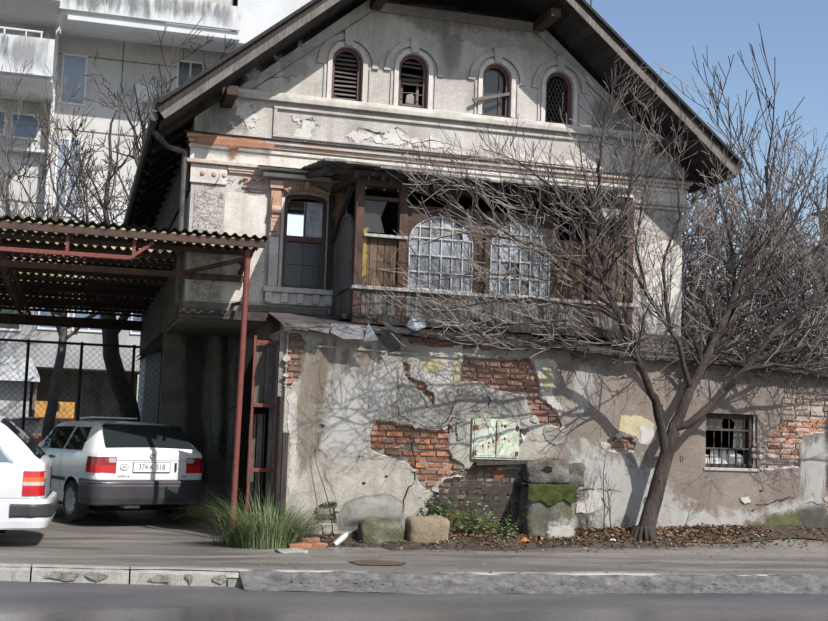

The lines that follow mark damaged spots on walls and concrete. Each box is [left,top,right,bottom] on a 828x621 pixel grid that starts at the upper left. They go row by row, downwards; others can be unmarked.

water stain [4,41,35,63]
peeling [292,118,315,142]
peeling [341,129,454,152]
flaking render [278,324,309,495]
crack [395,362,491,436]
flaking render [368,329,567,530]
peeling [580,415,656,454]
flaking render [750,390,828,471]
crack [402,436,416,512]
water stain [547,446,654,538]
water stain [657,424,828,528]